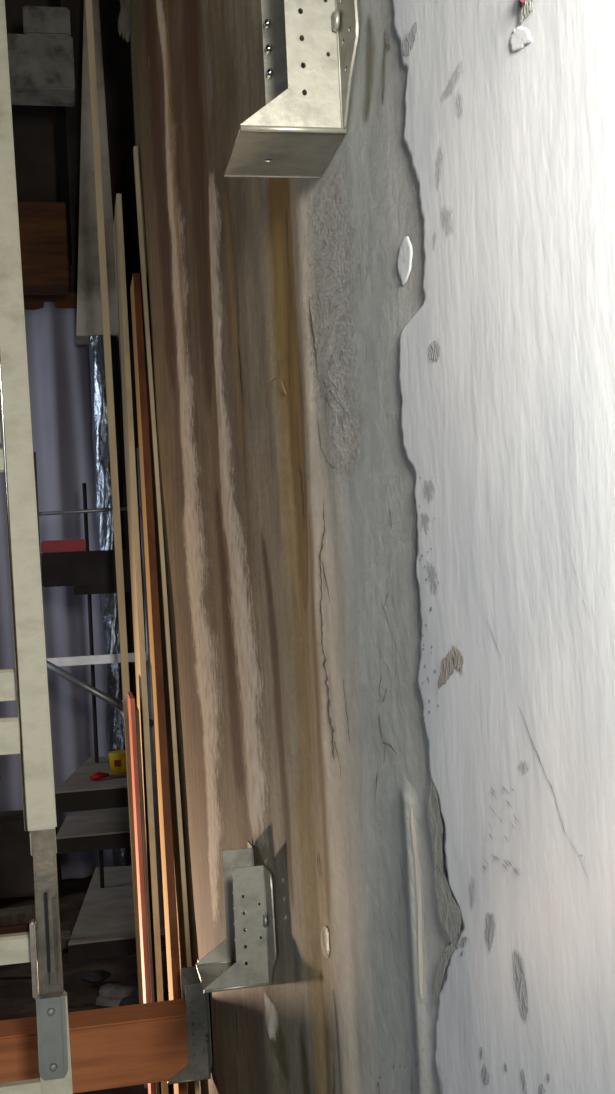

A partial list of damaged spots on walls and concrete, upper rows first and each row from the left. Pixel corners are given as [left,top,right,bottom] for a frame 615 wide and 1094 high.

peeling [402,23,417,56]
spalling [510,0,534,52]
peeling [397,236,413,285]
peeling [429,341,439,361]
peeling [422,624,463,721]
crack [519,708,588,878]
spalling [427,781,467,1002]
peeling [321,926,330,958]
peeling [513,951,528,1019]